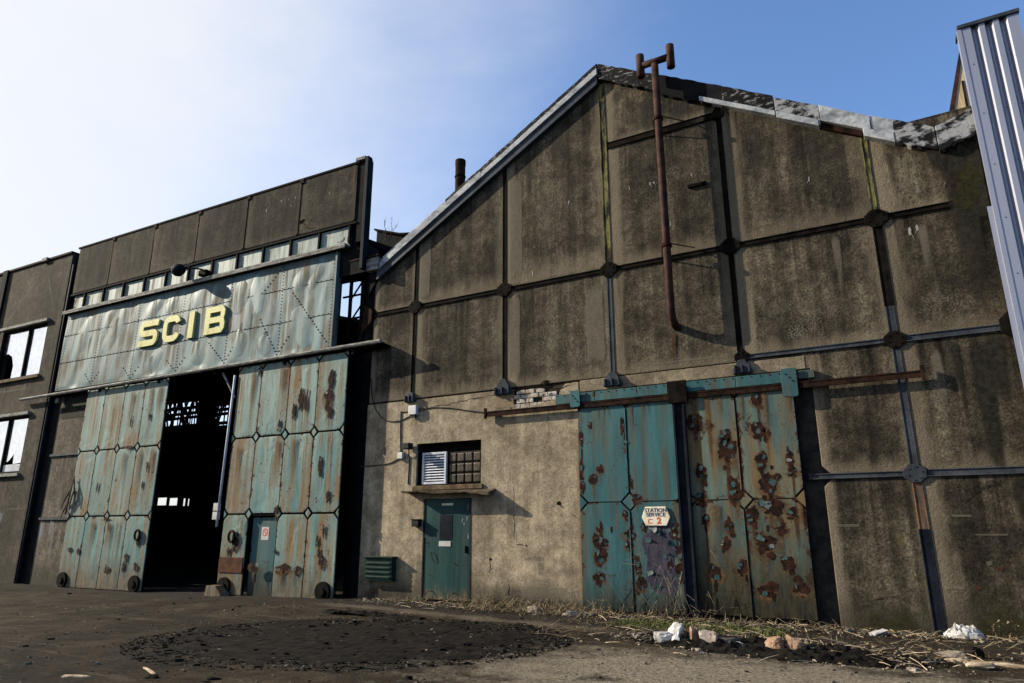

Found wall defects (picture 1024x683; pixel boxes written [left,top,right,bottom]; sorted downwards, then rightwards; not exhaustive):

water stain [420,243,431,297]
water stain [509,180,522,275]
water stain [833,239,841,262]
water stain [509,299,520,375]
water stain [538,289,605,370]
flaking render [510,380,564,409]
peeling [592,475,683,598]